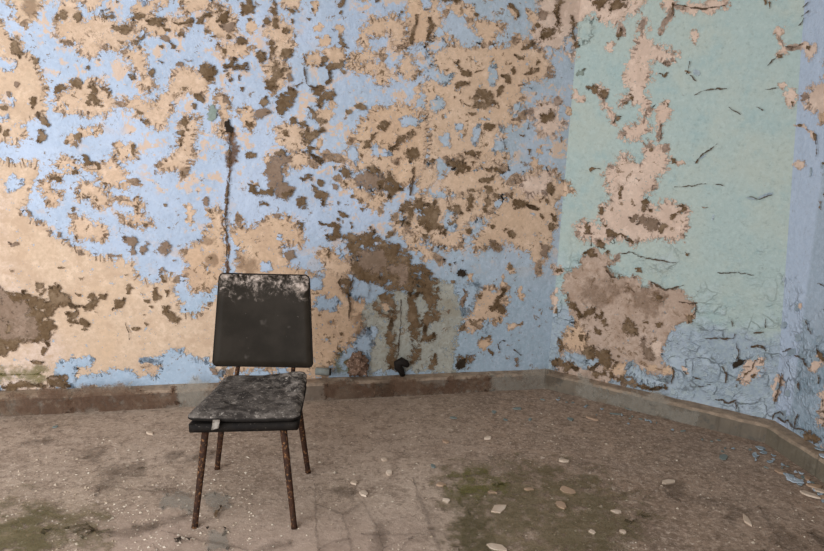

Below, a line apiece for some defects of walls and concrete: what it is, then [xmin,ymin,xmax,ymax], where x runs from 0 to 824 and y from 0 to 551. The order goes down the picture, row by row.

peeling [768,26,824,177]
corrosion [221,132,240,273]
peeling [0,0,732,416]
crack [671,319,824,446]
peeling [732,342,770,389]
peeling [787,303,823,368]